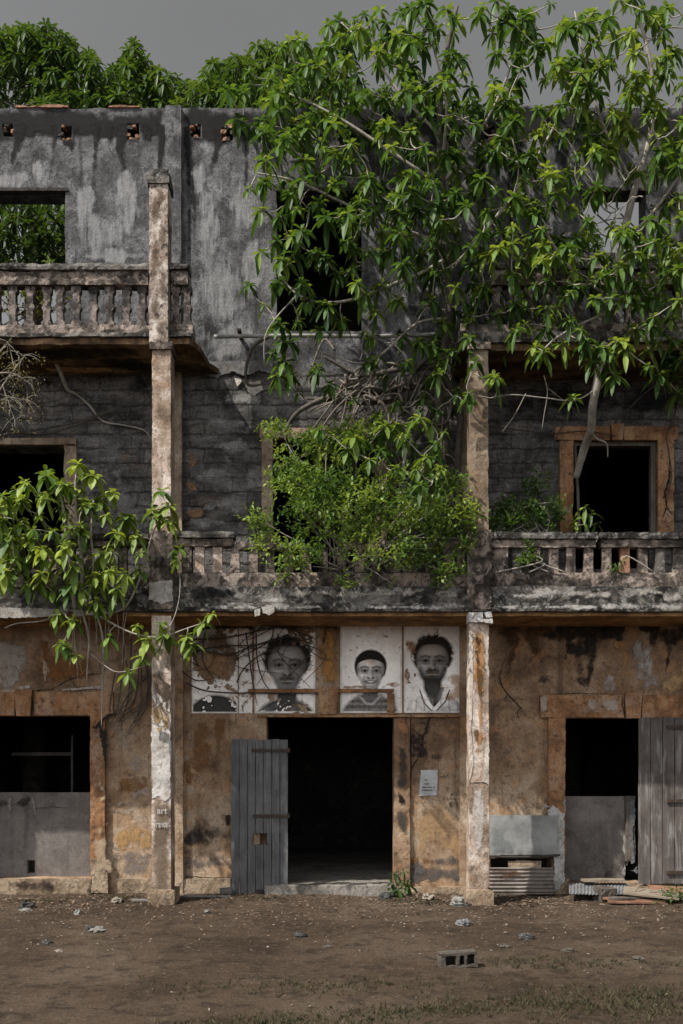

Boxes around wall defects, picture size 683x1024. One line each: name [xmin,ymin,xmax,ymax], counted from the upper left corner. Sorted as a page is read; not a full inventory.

damp [0,110,165,184]
peeling [193,166,218,253]
flaking render [205,242,273,396]
peeling [99,693,171,806]
peeling [469,611,493,850]
crack [499,662,642,718]
damp [544,626,625,685]
damp [639,626,683,692]